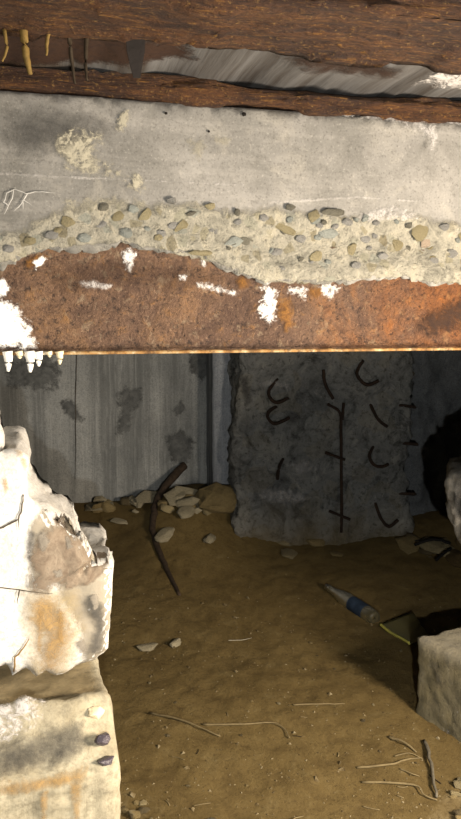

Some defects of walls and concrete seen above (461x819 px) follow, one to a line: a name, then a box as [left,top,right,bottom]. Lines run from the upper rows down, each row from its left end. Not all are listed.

crack [3,189,52,214]
efflorescence [123,248,137,271]
efflorescence [257,286,278,322]
efflorescence [0,279,64,372]
peeling [61,400,82,421]
spalling [322,369,351,533]
crack [0,494,24,529]
spalling [29,514,110,594]
crack [0,587,49,603]
crack [13,639,29,672]
damp [0,696,44,740]
damp [2,732,79,772]